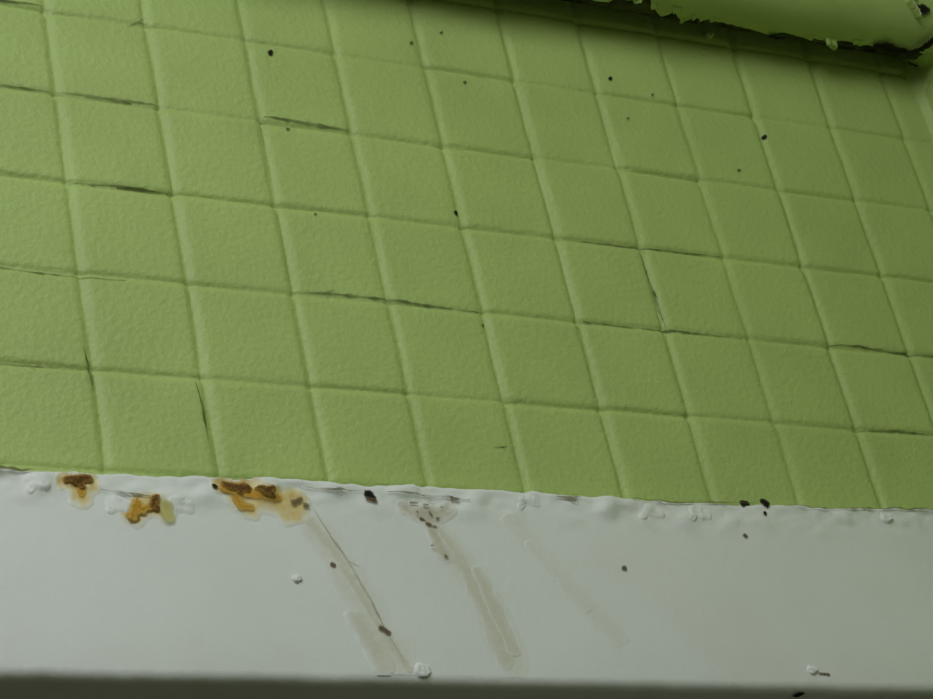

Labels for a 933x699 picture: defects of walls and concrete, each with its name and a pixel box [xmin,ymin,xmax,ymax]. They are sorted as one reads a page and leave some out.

peeling [905,0,930,19]
peeling [807,36,863,51]
peeling [873,37,933,67]
rust [53,471,105,510]
rust [117,489,179,530]
rust [209,476,311,528]